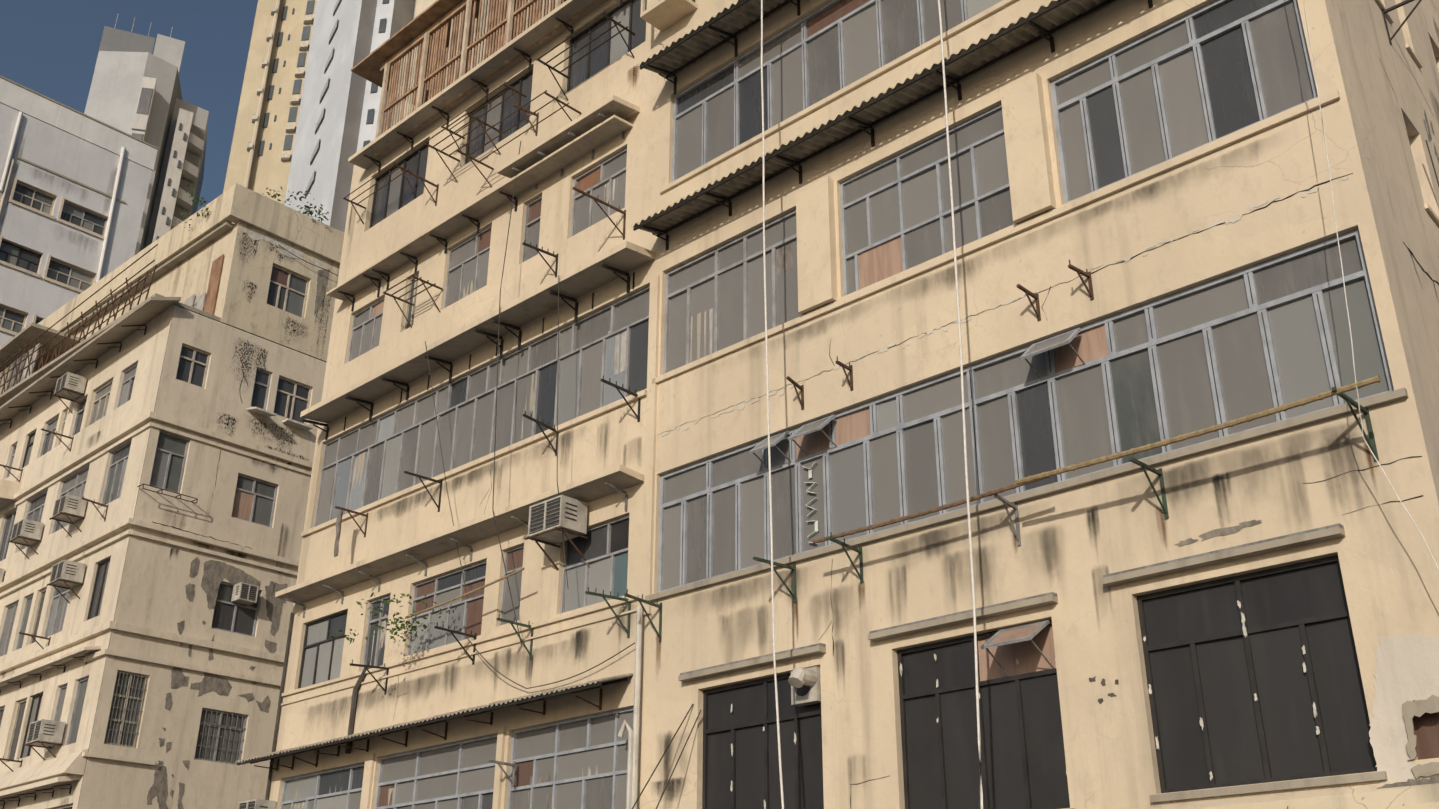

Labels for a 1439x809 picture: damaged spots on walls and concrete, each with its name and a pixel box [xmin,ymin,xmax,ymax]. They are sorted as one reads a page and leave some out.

crack [664,173,1353,432]
crack [1403,242,1439,301]
damp [235,341,266,377]
damp [219,414,304,465]
peeling [165,557,287,713]
peeling [147,727,190,809]
spalling [1377,695,1439,789]